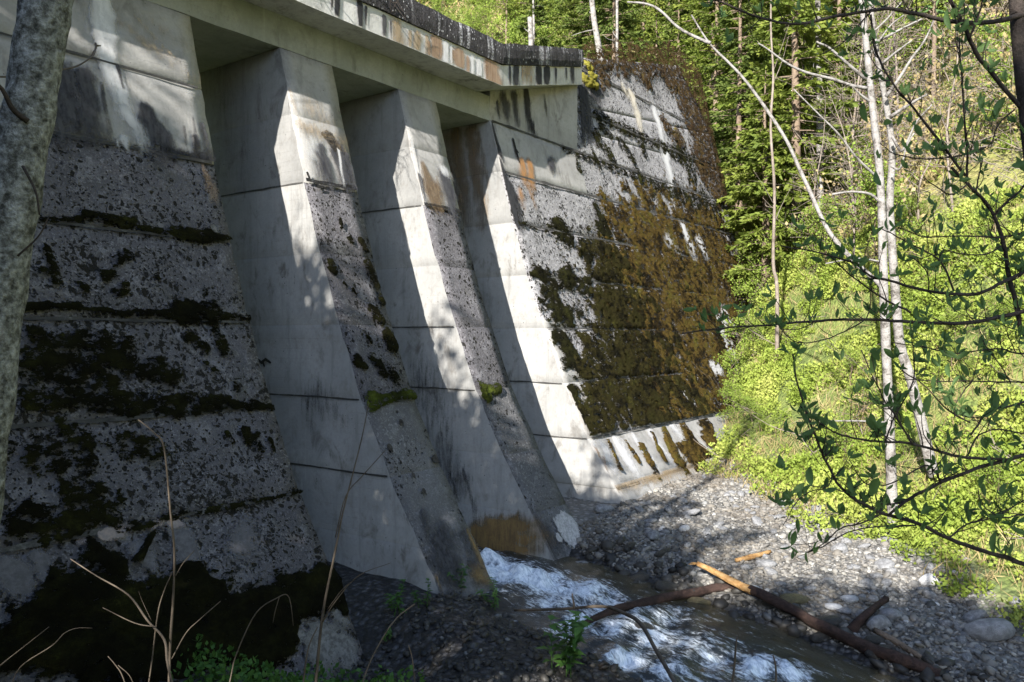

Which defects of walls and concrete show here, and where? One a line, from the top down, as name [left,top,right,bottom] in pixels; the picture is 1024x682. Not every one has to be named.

leakage [51,0,216,163]
rust [393,20,470,72]
rust [485,58,502,85]
rust [519,158,535,200]
leakage [492,65,604,234]
leakage [421,506,566,594]